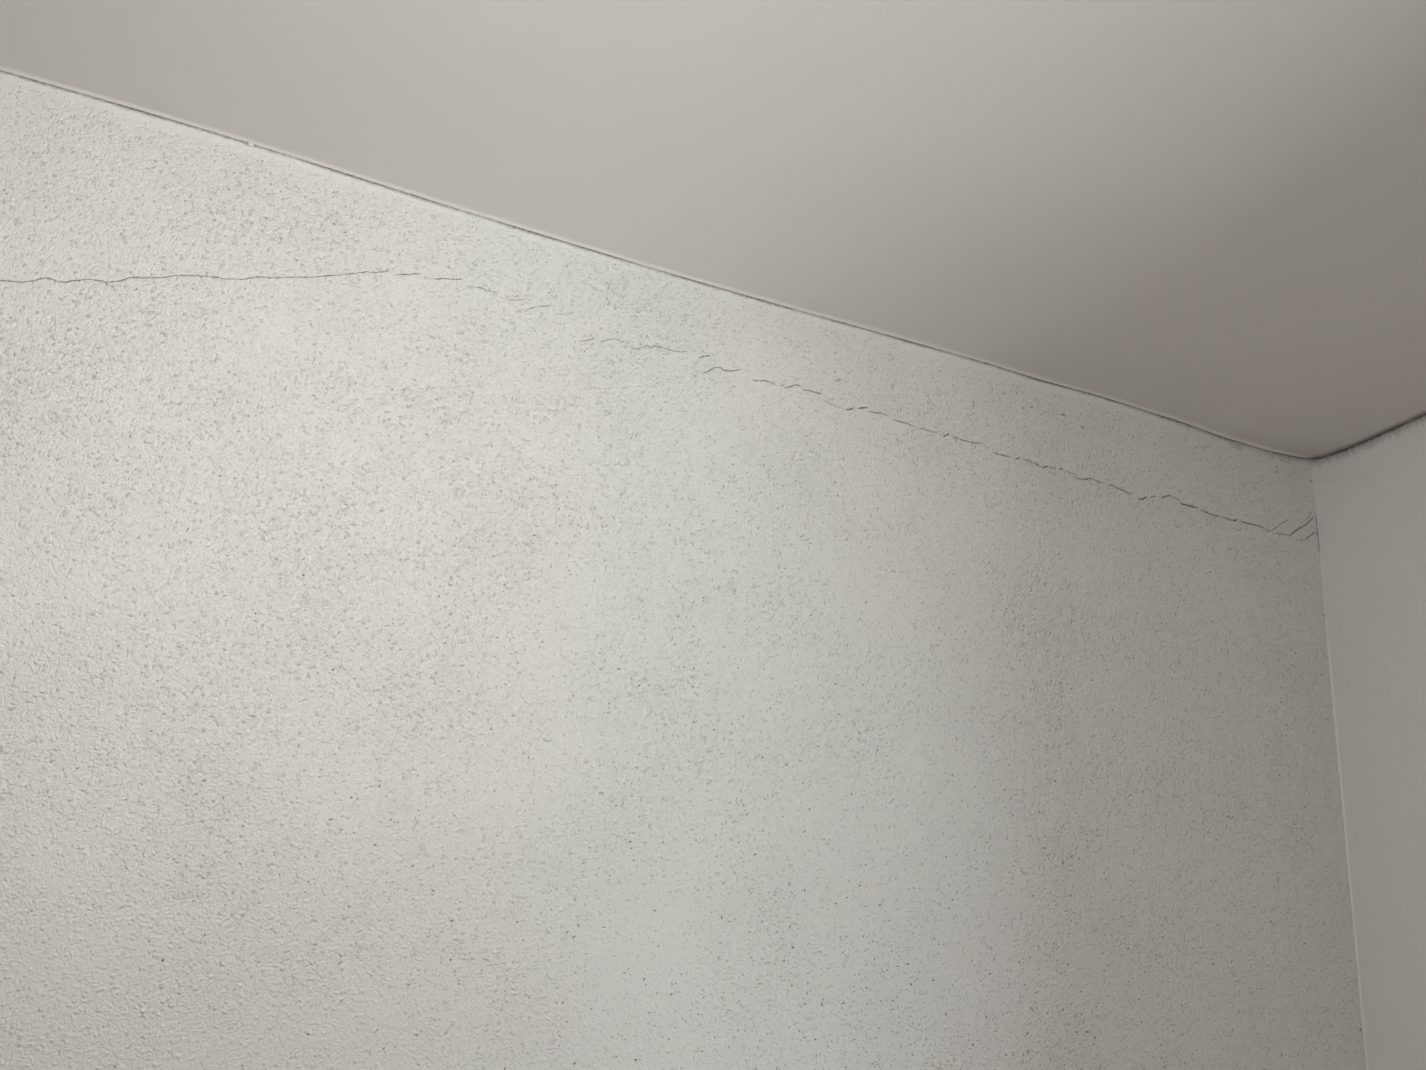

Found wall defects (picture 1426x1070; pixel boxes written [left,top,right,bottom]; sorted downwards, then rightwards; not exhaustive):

crack [311,162,447,206]
crack [500,222,633,263]
crack [672,274,1426,460]